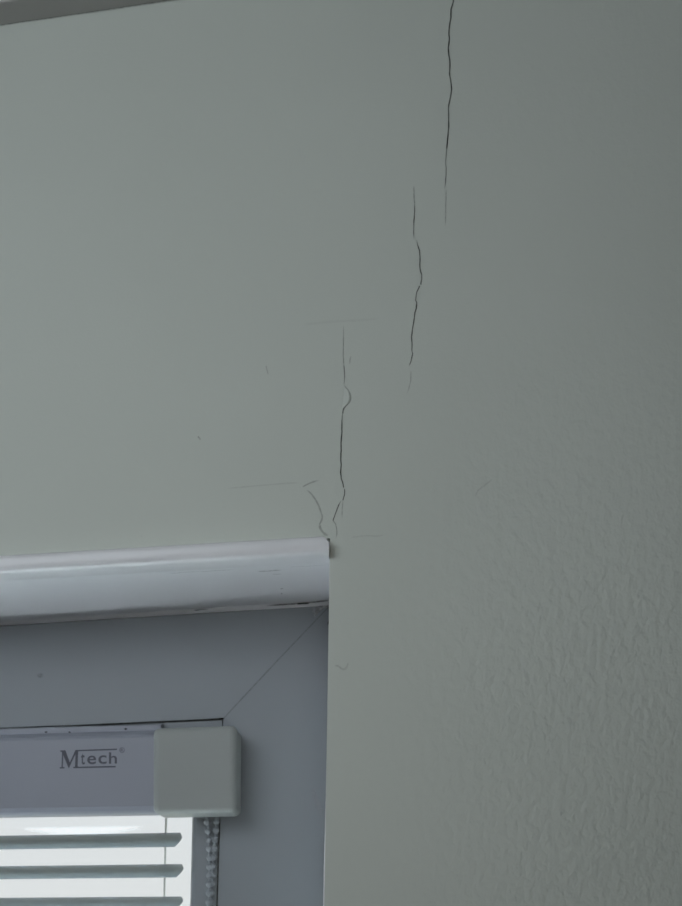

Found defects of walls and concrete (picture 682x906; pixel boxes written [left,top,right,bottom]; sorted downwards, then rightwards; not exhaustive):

crack [445,0,454,184]
crack [410,206,422,363]
crack [333,422,345,520]